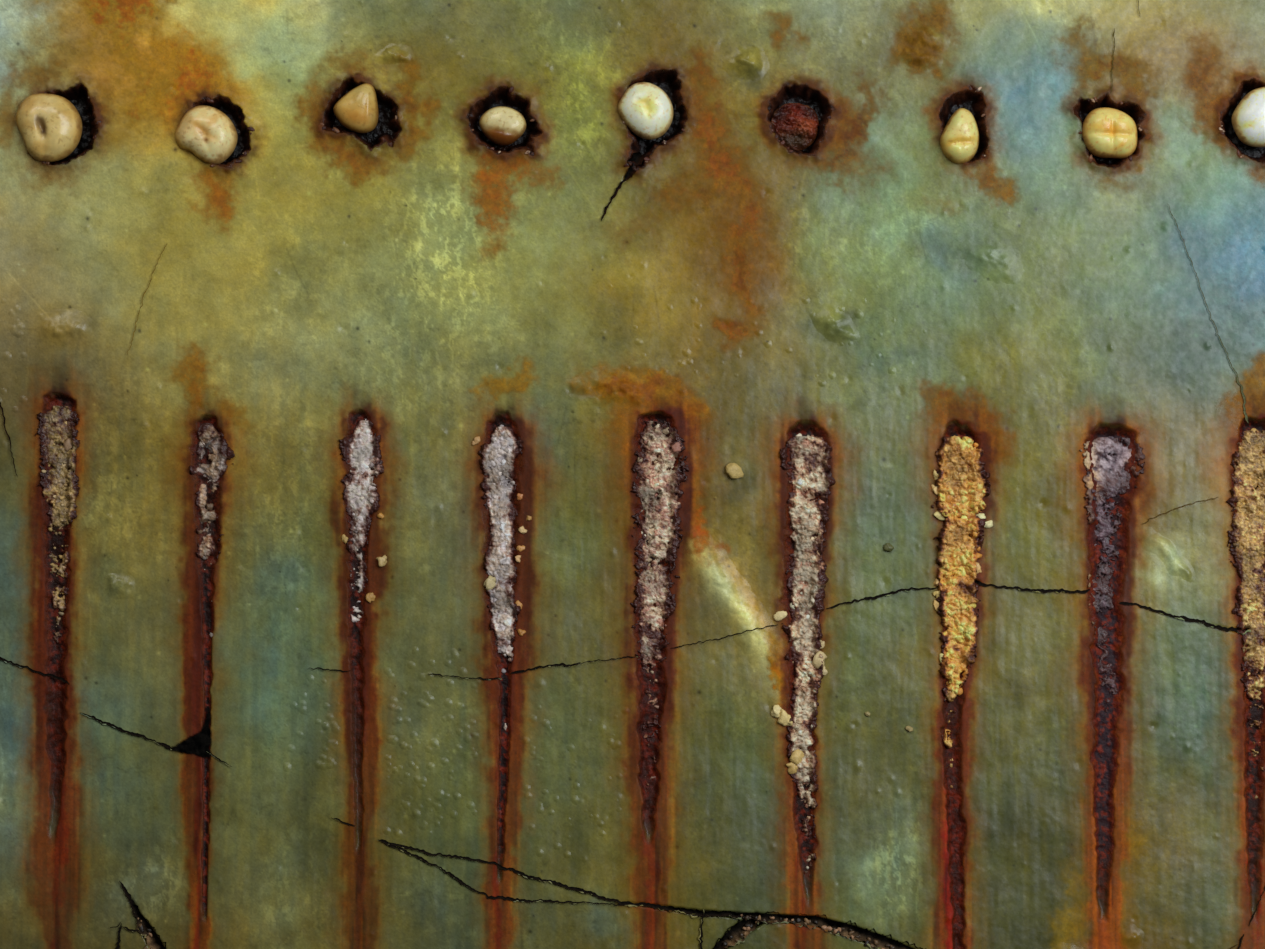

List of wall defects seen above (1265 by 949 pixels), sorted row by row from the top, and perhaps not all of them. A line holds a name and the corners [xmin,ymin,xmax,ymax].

crack [110,881,166,949]
crack [81,706,232,767]
rust [330,403,392,949]
rust [468,361,546,949]
crack [332,818,923,949]
rust [582,367,724,949]
rust [768,414,843,949]
crack [826,587,937,609]
rust [922,386,1014,949]
crack [975,581,1090,594]
rust [1076,415,1155,949]
crack [1119,602,1251,634]